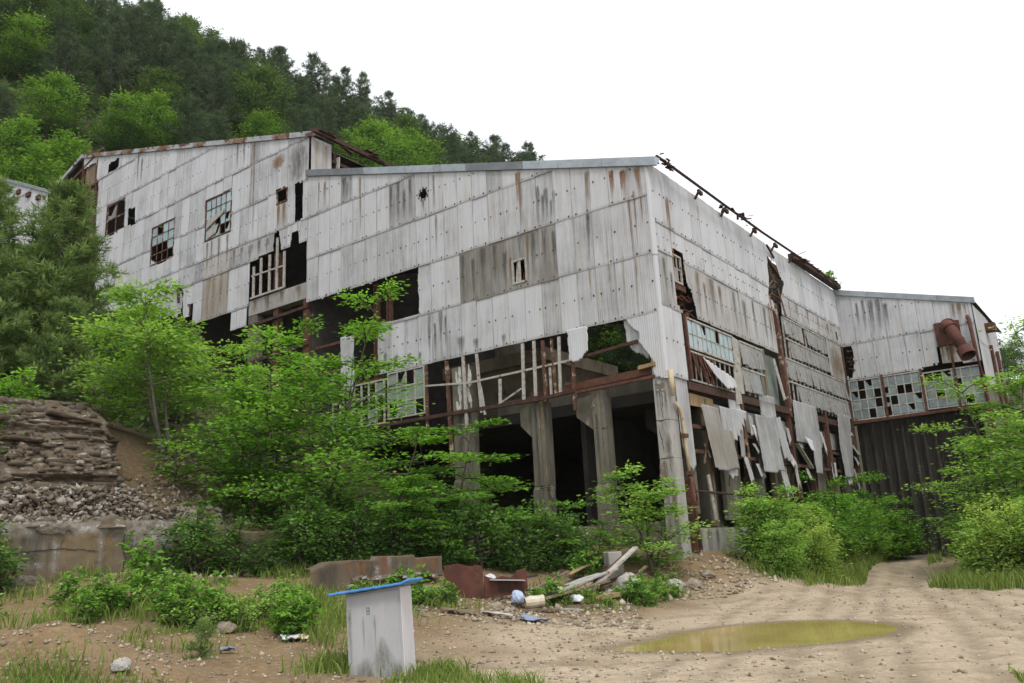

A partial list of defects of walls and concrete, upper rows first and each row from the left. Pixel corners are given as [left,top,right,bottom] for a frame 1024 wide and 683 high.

corrosion [609,169,642,226]